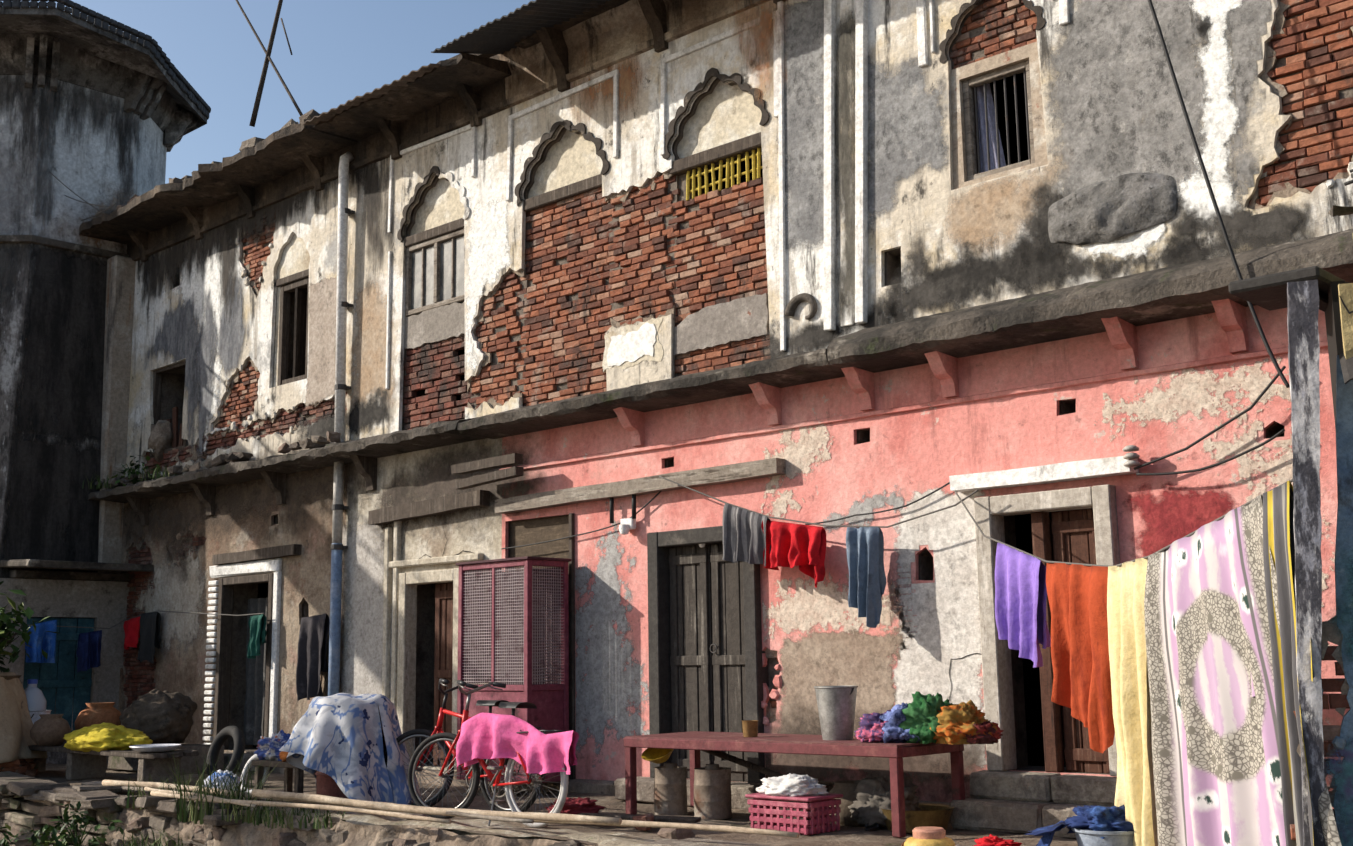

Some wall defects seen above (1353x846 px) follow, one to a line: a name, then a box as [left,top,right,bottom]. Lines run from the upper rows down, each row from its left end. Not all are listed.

water stain [0,74,140,581]
flaking render [143,358,347,474]
flaking render [236,216,275,296]
water stain [121,157,394,469]
water stain [466,199,511,371]
flaking render [467,264,526,409]
flaking render [602,171,677,372]
water stain [763,0,1307,359]
peeling [1095,356,1293,559]
flaking render [1247,0,1353,210]
water stain [122,442,540,701]
flaking render [1321,552,1353,846]